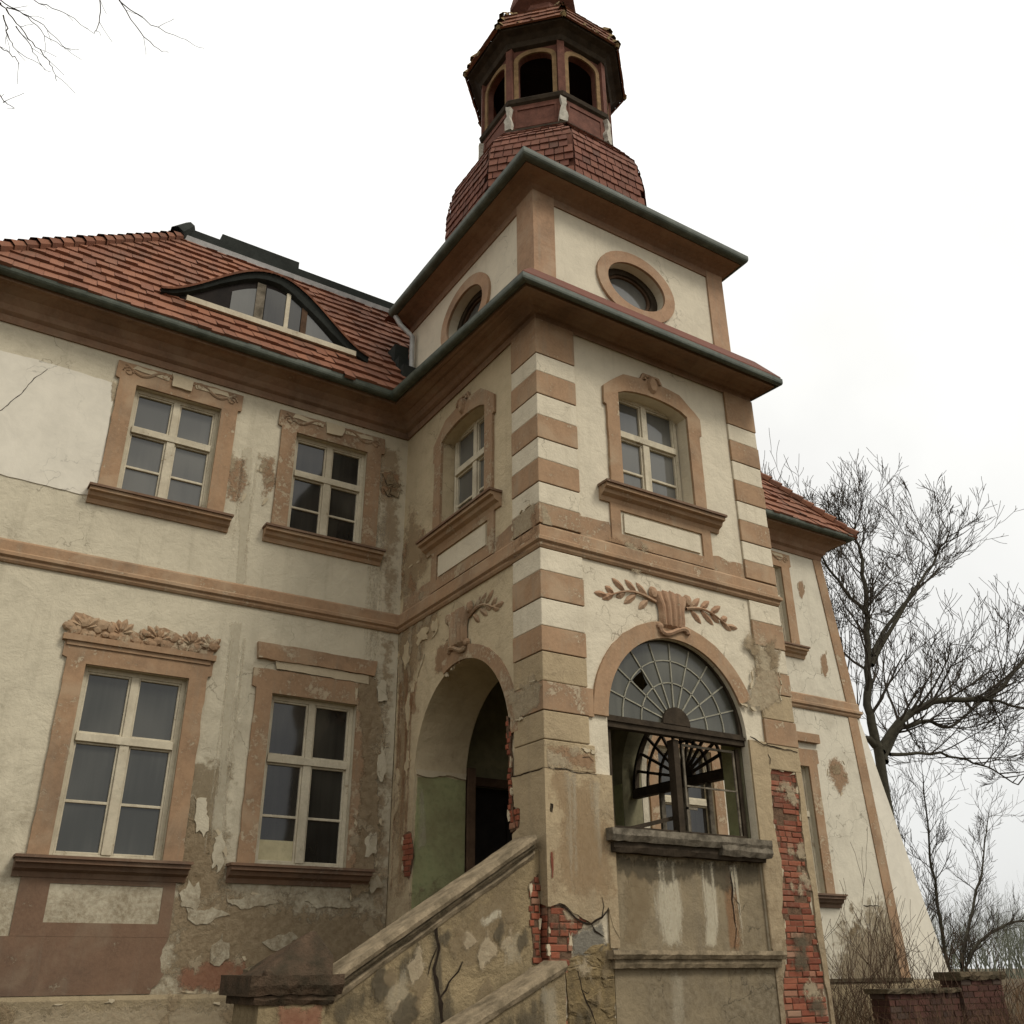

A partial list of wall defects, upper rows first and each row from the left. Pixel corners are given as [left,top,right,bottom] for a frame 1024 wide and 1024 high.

peeling [226,453,276,505]
flaking render [739,634,782,711]
peeling [820,651,828,677]
peeling [505,675,542,833]
peeling [827,758,849,796]
peeling [0,674,389,1024]
flaking render [401,831,415,879]
flaking render [528,874,586,973]
crack [561,898,609,937]
flaking render [771,769,829,1024]
crack [428,928,463,1024]